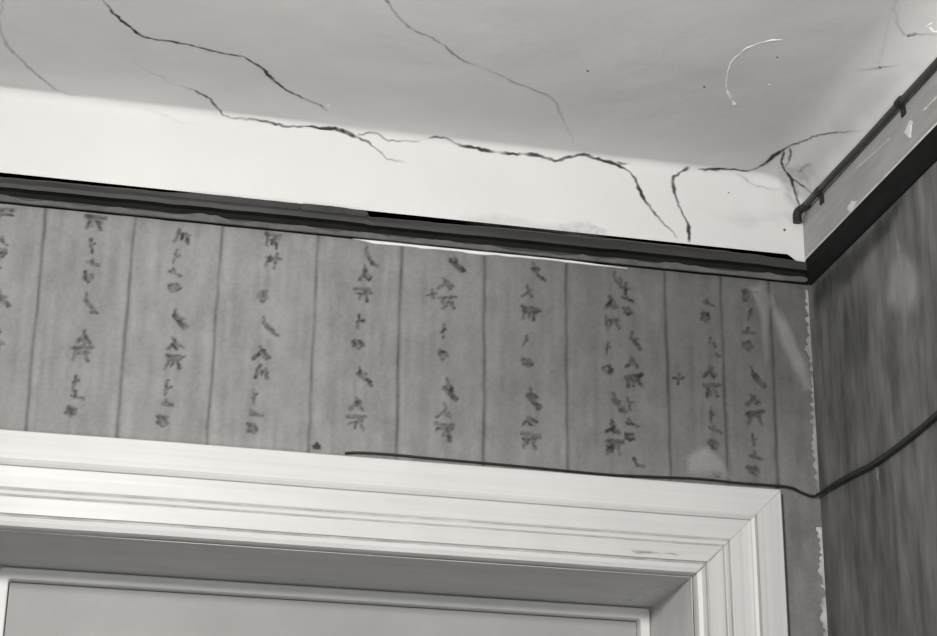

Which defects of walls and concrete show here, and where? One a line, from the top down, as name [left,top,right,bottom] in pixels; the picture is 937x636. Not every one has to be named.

crack [108,6,302,98]
crack [258,120,370,143]
crack [431,136,657,216]
crack [672,132,834,240]